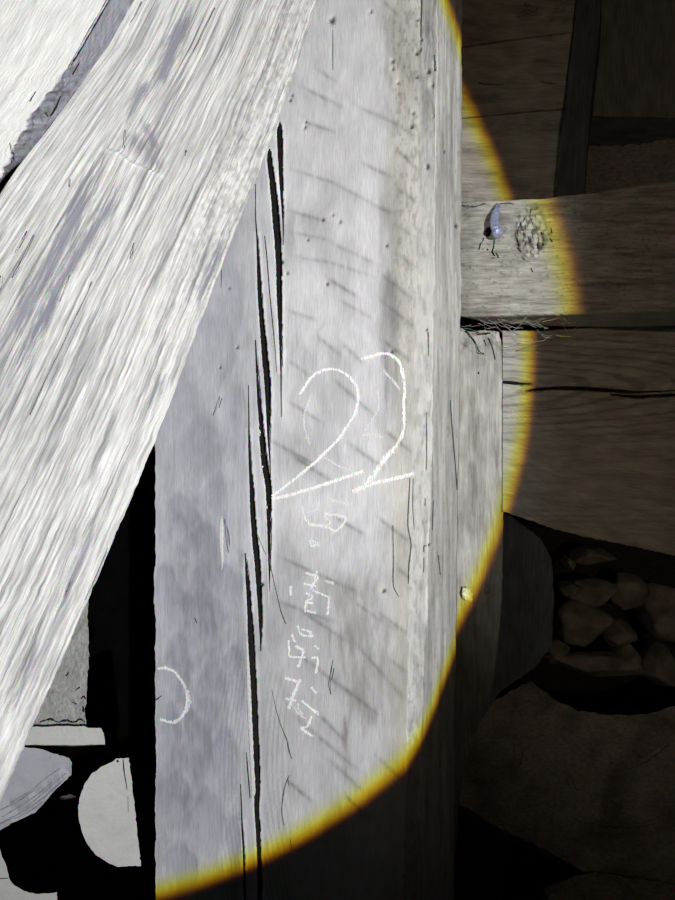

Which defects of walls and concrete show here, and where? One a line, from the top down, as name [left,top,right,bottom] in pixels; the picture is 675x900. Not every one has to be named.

crack [240,122,292,900]
crack [504,381,675,398]